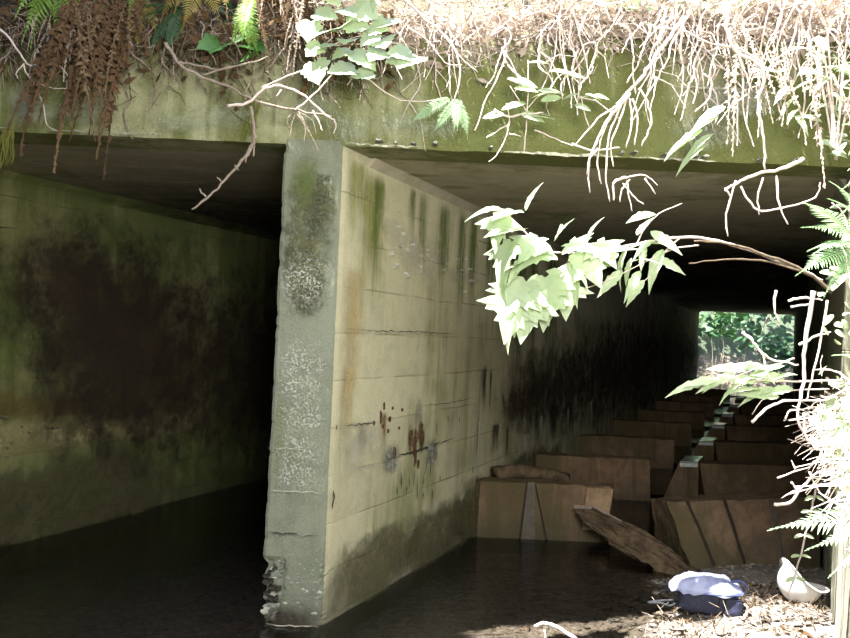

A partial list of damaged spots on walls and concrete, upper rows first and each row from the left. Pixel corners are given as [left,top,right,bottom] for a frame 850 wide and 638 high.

damp [142,165,336,314]
damp [352,165,385,256]
damp [412,191,426,229]
rust [373,402,424,469]
damp [335,478,480,600]
spalling [260,554,322,619]